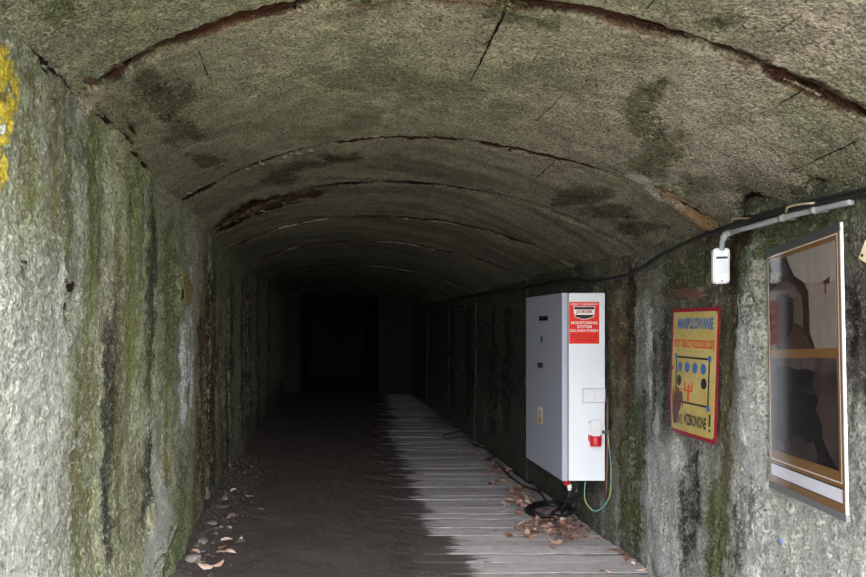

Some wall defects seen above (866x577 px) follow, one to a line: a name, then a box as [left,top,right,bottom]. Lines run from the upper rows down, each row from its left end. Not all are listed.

crack [31,0,866,116]
corrosion [215,188,325,231]
crack [234,135,598,196]
leakage [100,296,118,561]